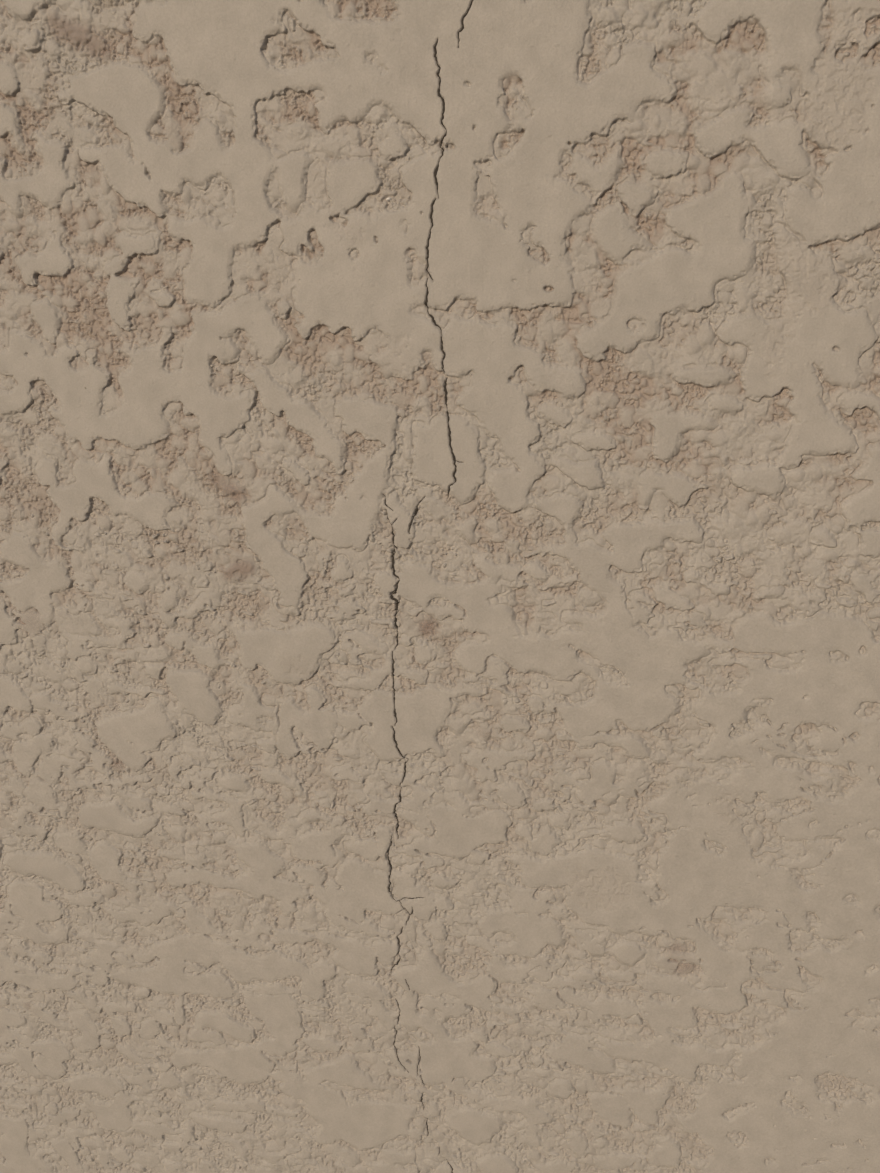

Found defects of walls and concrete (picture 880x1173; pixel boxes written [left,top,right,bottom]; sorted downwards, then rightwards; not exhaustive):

crack [383,0,473,1173]